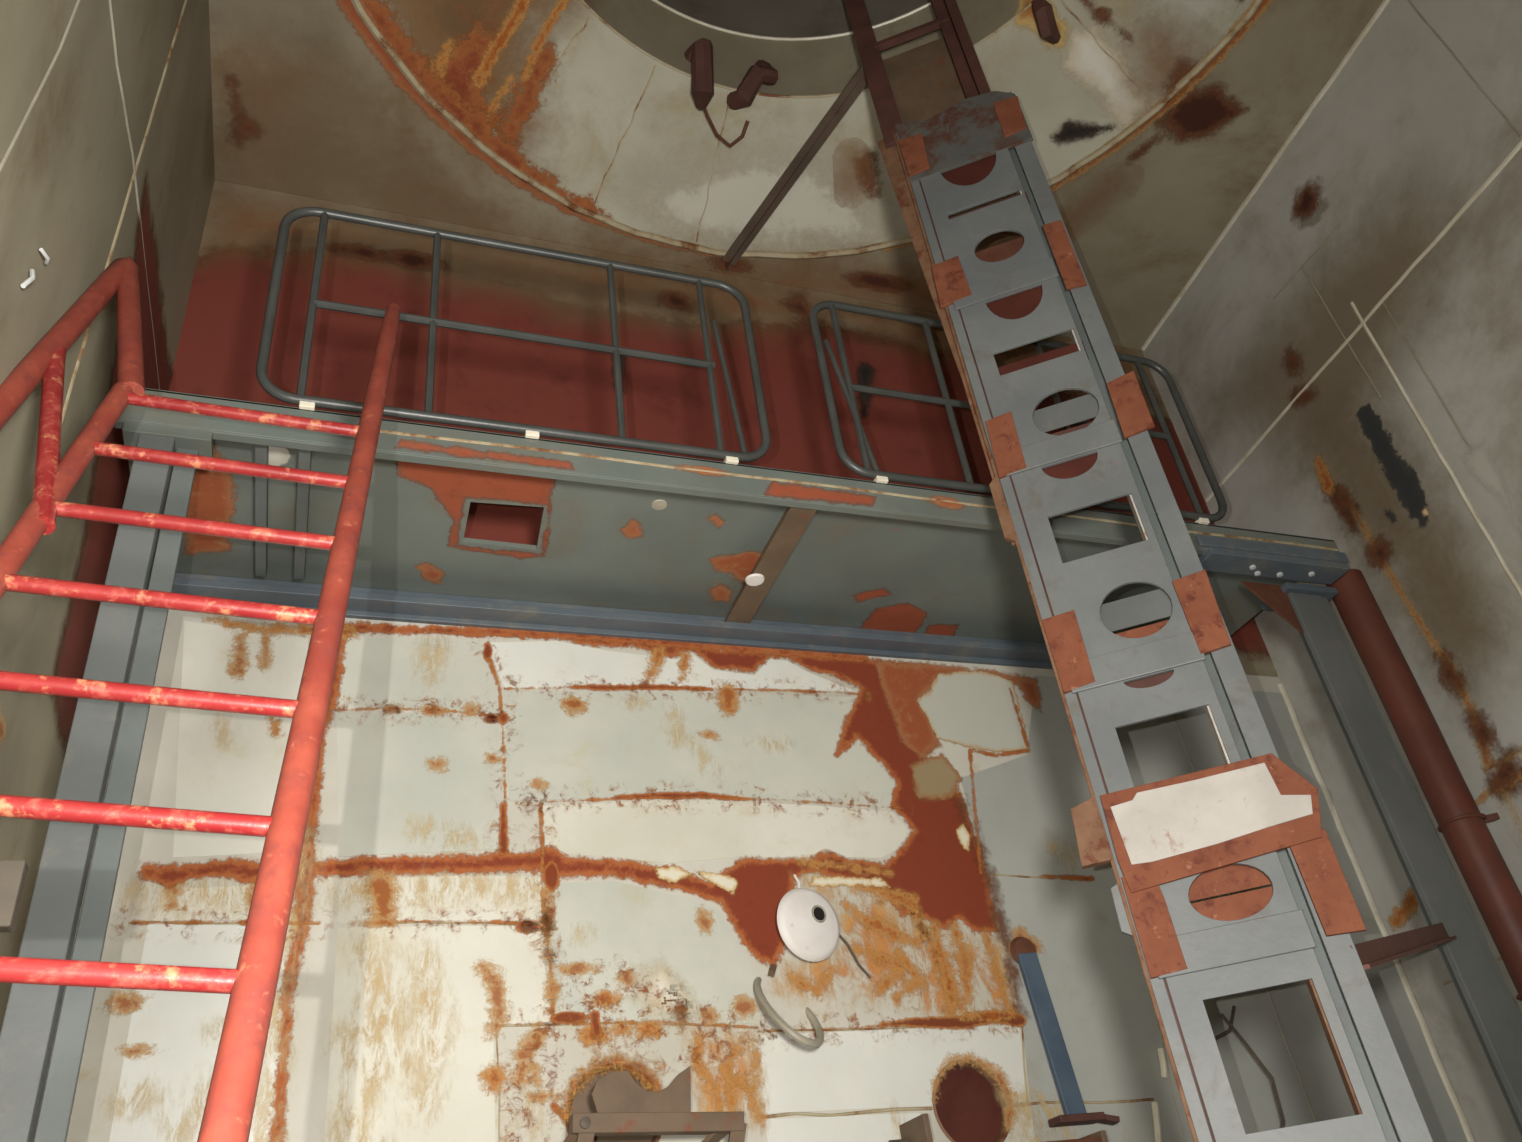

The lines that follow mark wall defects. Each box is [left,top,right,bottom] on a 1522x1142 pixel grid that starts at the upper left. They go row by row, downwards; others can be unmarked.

corrosion [1050,0,1273,192]
leakage [1225,221,1473,645]
corrosion [203,617,313,678]
corrosion [1313,456,1522,805]
corrosion [105,991,145,1015]
corrosion [121,1043,152,1059]
corrosion [255,621,868,1142]
corrosion [786,857,1042,1017]